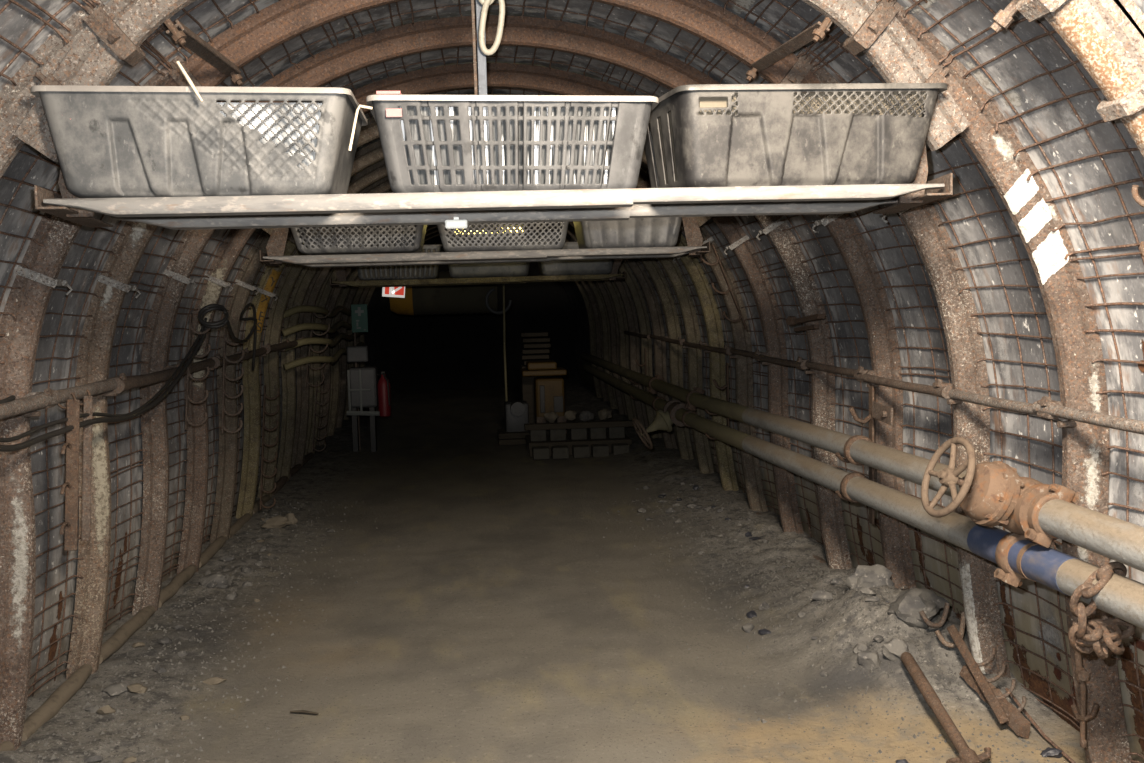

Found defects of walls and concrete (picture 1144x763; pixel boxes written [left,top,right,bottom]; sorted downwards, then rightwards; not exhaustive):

damp [11,489,28,642]
corrosion [999,581,1080,732]
corrosion [1120,640,1144,755]